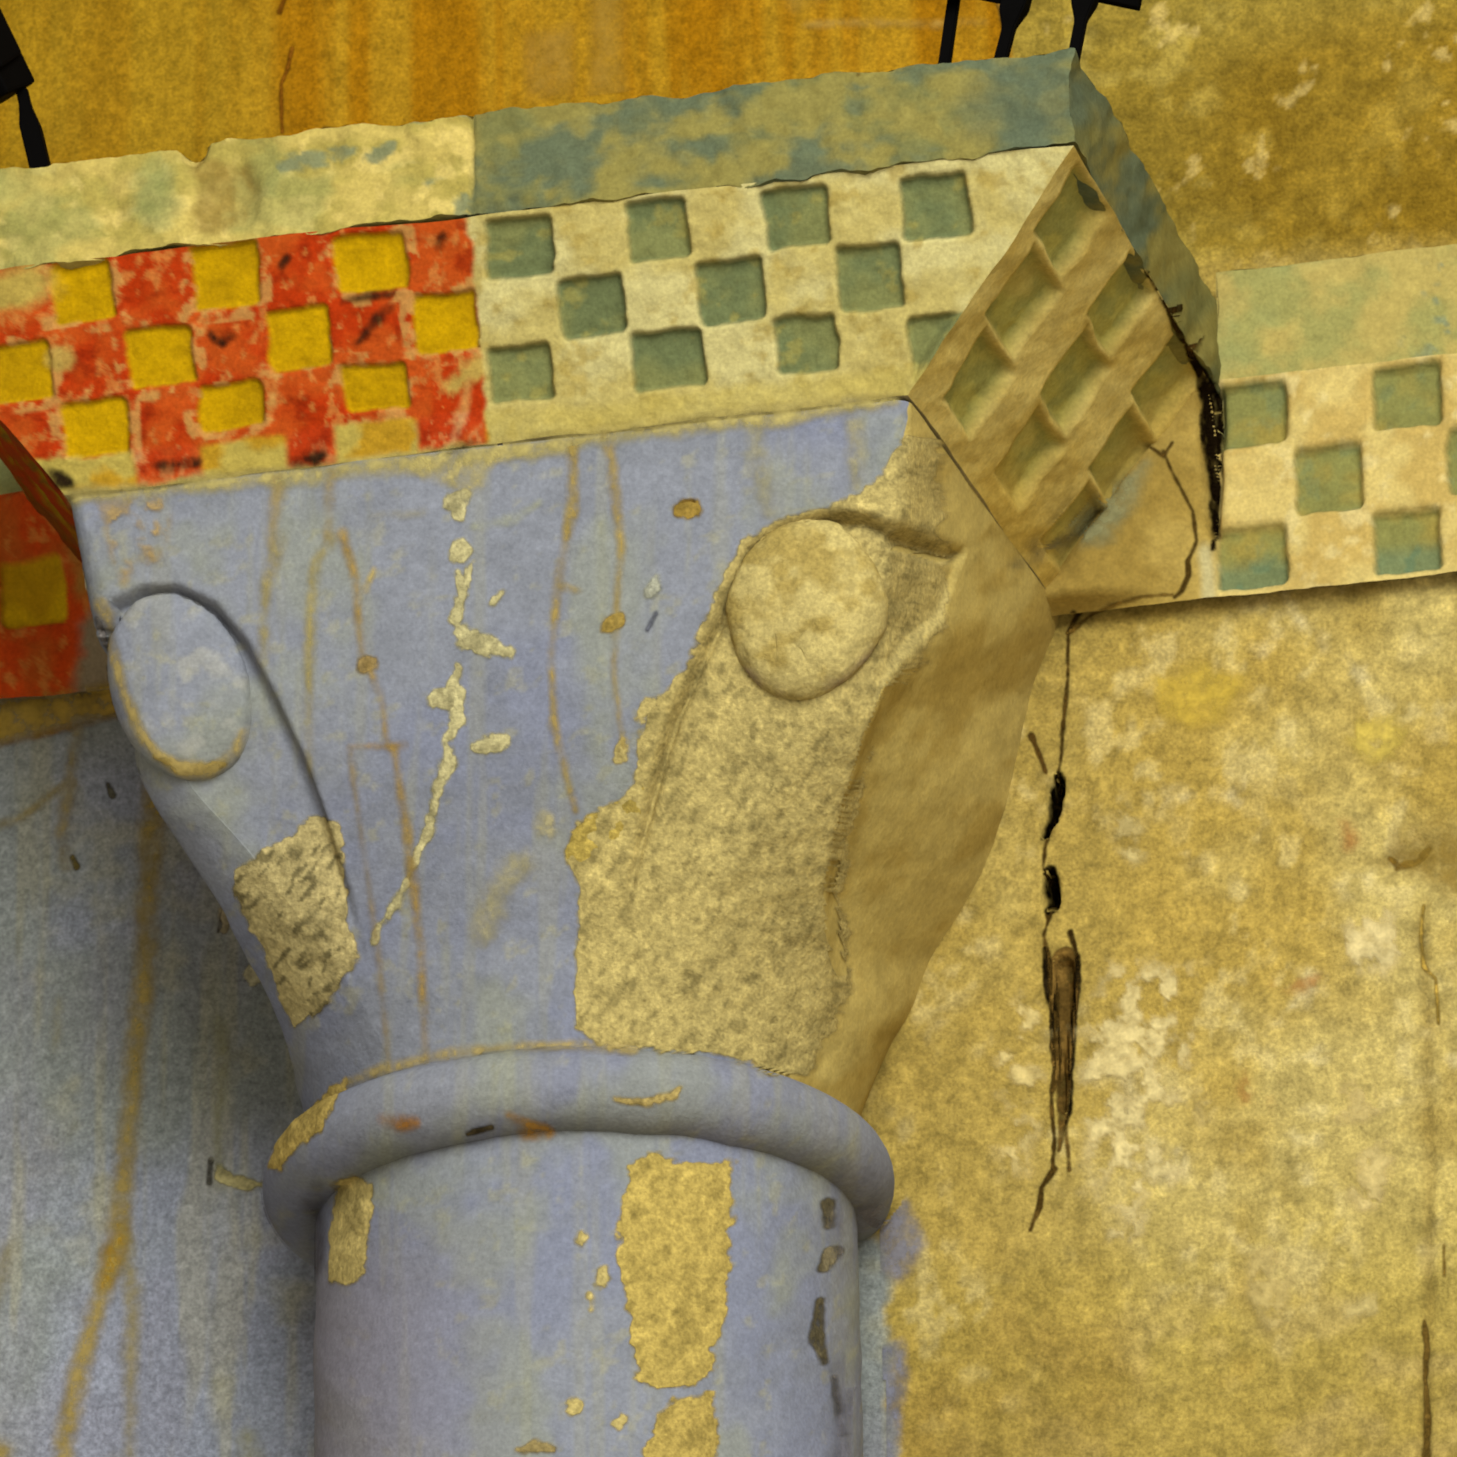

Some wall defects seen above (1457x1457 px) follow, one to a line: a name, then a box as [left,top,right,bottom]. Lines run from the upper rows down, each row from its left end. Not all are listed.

peeling [206,435,956,1191]
crack [1028,271,1225,1231]
peeling [328,1177,374,1285]
peeling [566,1398,584,1416]
peeling [575,1230,589,1246]
peeling [586,1153,736,1457]